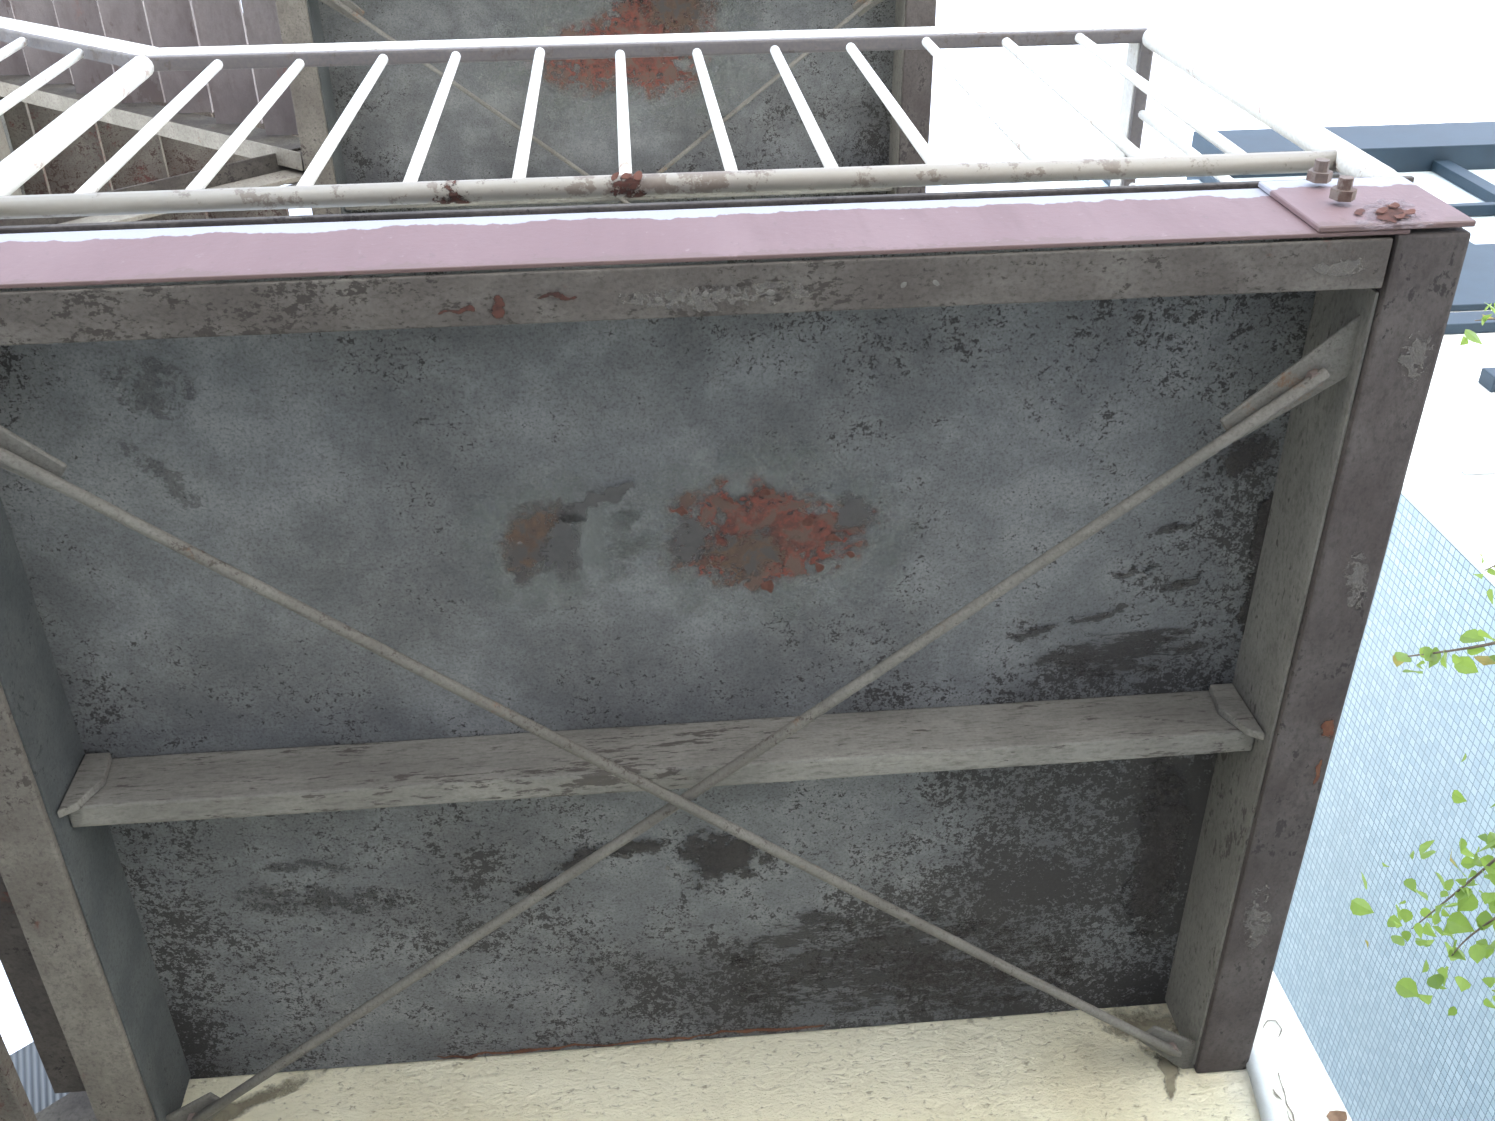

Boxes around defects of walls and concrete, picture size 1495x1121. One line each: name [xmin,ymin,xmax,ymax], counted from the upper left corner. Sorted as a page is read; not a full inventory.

rust [527,0,754,38]
rust [488,55,758,120]
rust [610,171,647,199]
rust [1354,202,1416,223]
rust [438,295,505,320]
rust [537,292,577,301]
rust [473,449,903,615]
crack [1263,1020,1295,1121]